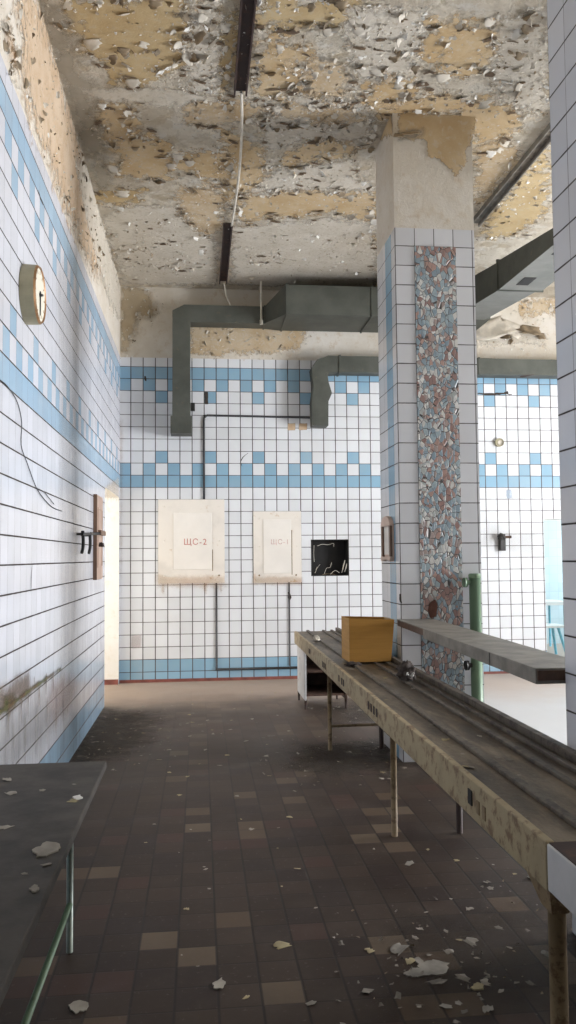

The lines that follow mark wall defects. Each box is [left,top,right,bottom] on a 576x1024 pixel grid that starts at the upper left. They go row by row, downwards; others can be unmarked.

peeling [1,0,555,362]
leakage [0,668,61,731]